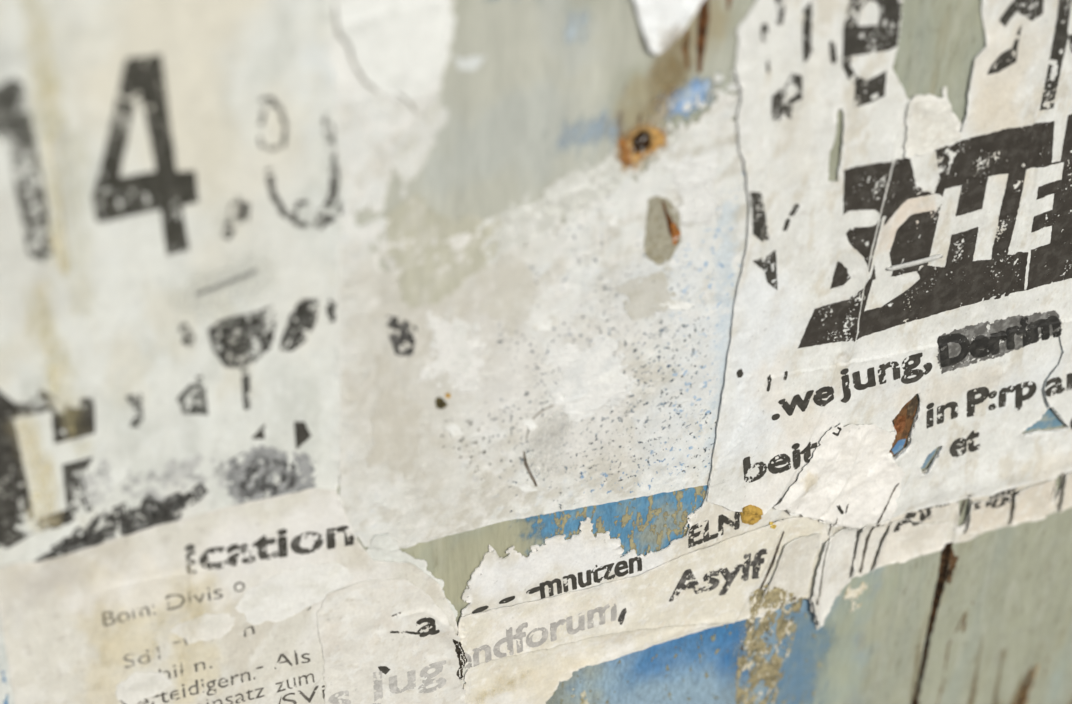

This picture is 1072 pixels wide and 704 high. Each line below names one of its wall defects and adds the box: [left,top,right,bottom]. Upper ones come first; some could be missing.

rust [681,0,710,73]
rust [617,96,668,169]
peeling [550,584,806,704]
crack [911,542,974,704]
crack [969,653,1023,704]